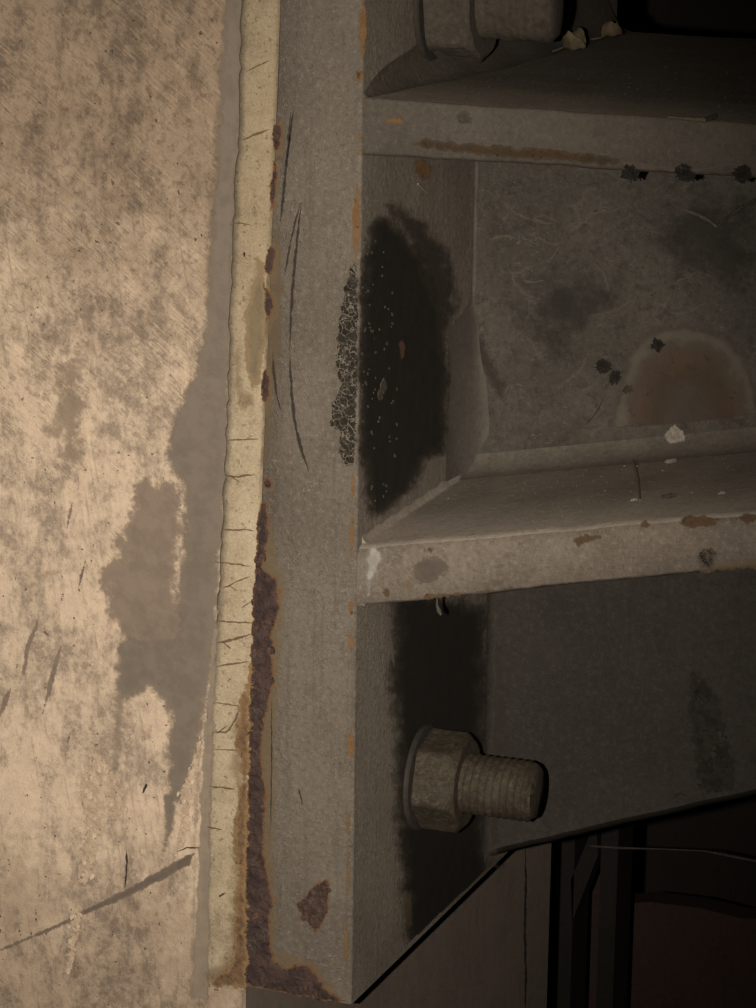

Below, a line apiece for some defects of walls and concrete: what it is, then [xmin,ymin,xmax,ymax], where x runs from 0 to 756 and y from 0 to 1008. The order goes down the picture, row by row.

rust [270,124,283,210]
rust [413,138,675,180]
damp [390,206,459,327]
rust [261,233,282,462]
damp [99,0,242,846]
rust [209,502,345,1002]
crack [122,851,130,888]